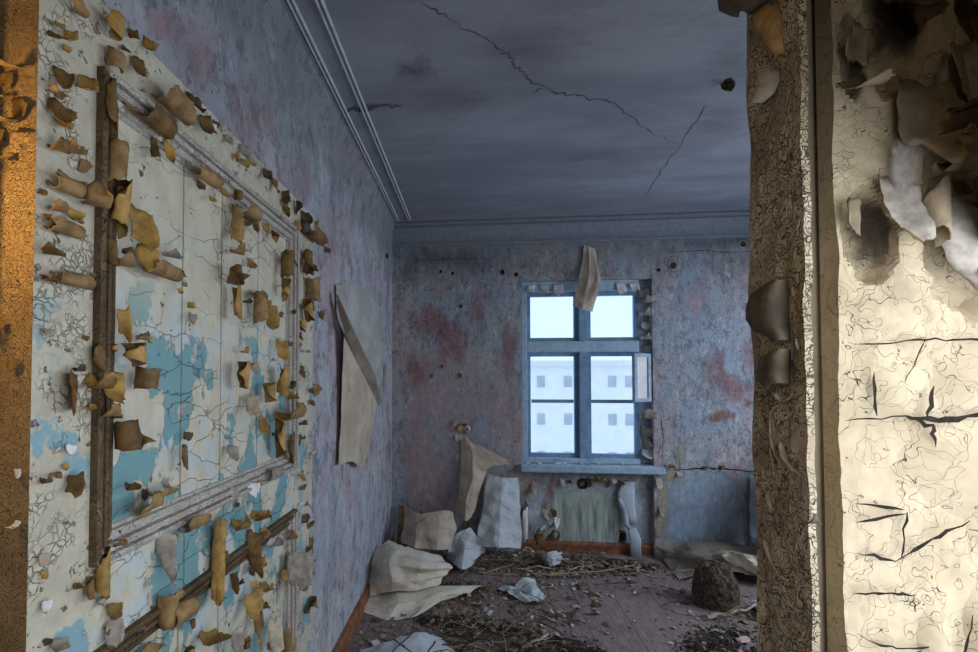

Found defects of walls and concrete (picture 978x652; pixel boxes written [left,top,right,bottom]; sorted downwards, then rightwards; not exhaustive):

peeling [70,0,90,19]
peeling [718,0,784,104]
crack [422,4,704,190]
peeling [837,0,978,291]
peeling [38,9,331,652]
crack [849,337,978,379]
crack [846,372,978,447]
crack [856,503,978,563]
crack [855,592,916,612]
crack [859,634,930,650]
crack [963,615,973,652]